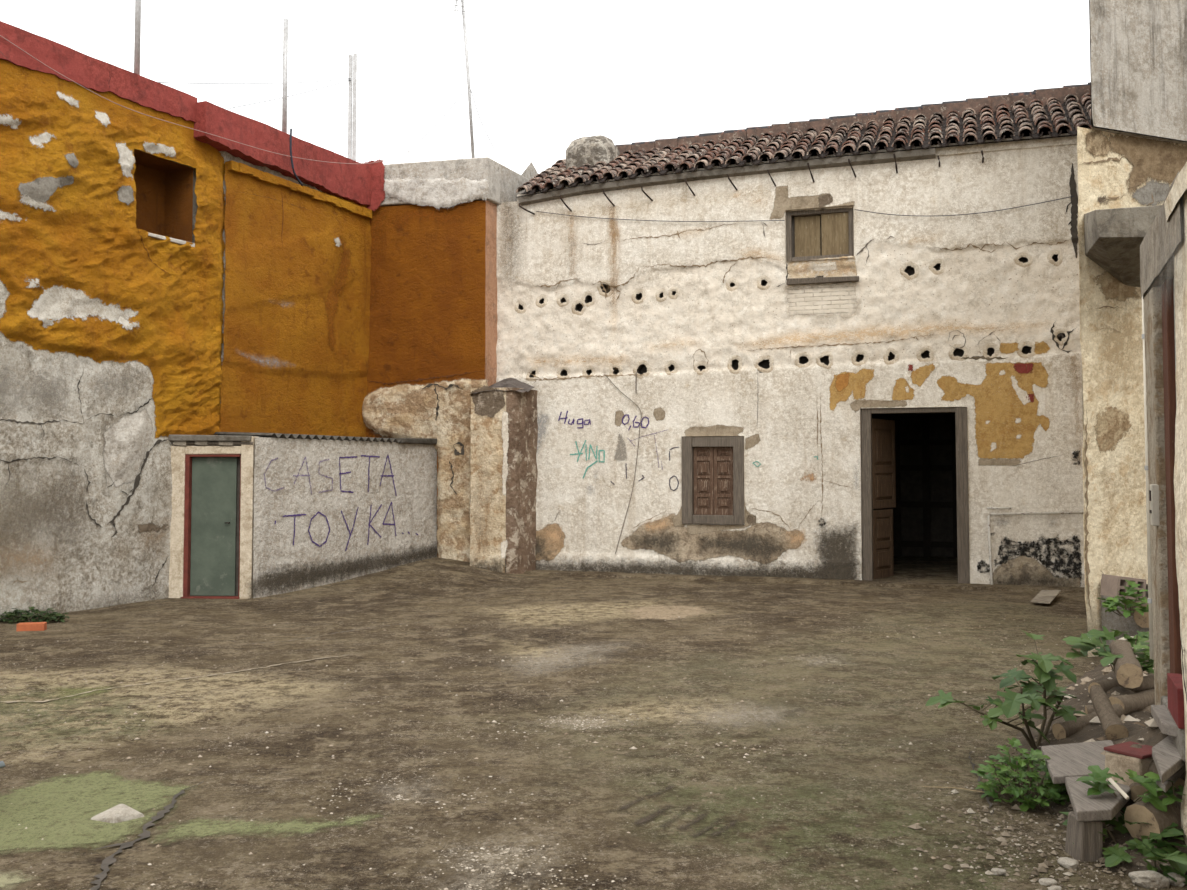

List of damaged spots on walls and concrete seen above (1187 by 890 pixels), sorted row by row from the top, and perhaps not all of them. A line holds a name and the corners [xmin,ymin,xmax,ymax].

peeling [56,91,79,108]
spalling [0,153,79,222]
crack [535,222,789,299]
peeling [24,278,140,331]
peeling [829,341,1050,466]
crack [0,367,168,537]
spalling [535,523,565,561]
spalling [621,506,804,565]